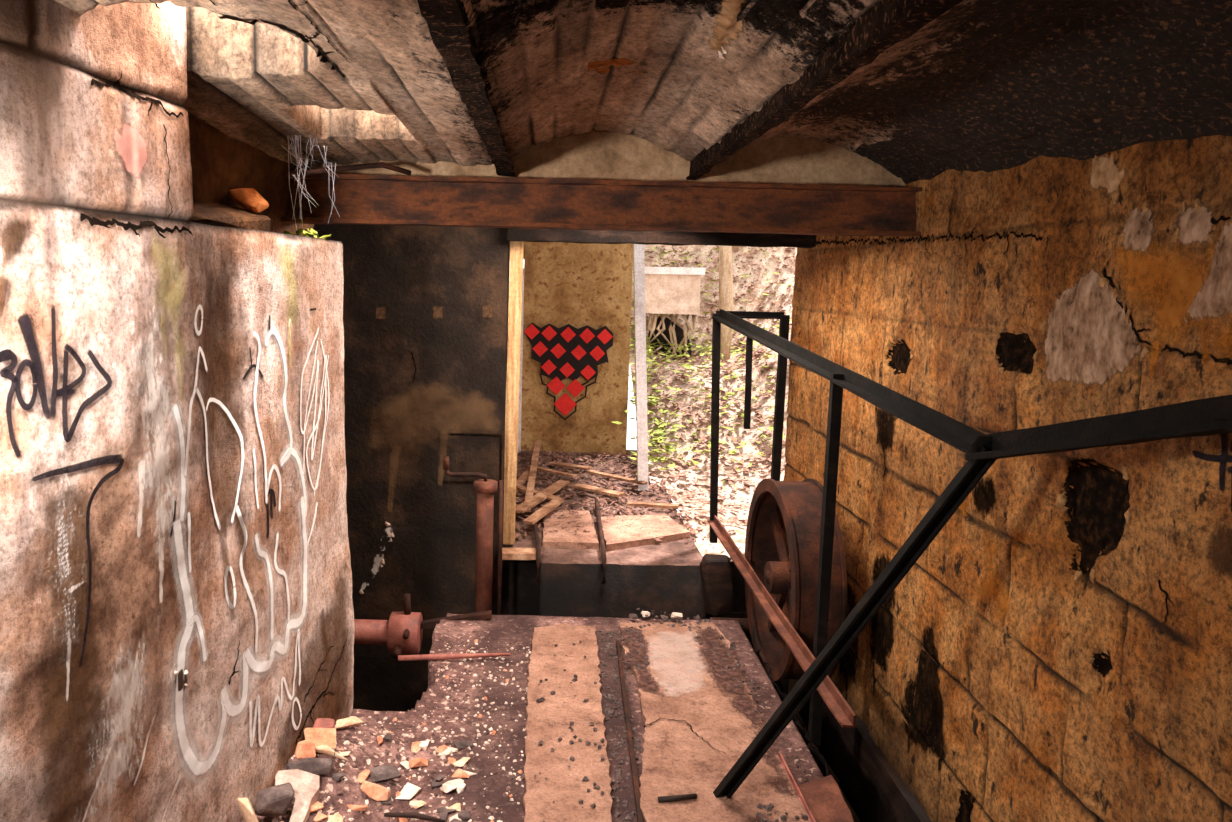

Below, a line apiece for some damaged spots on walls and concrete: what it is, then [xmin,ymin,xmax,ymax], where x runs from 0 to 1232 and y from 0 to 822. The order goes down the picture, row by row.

crack [815,226,1044,258]
peeling [1090,155,1154,252]
peeling [1172,198,1232,325]
crack [1103,268,1232,365]
leakage [373,388,494,512]
leakage [872,554,891,582]
leakage [838,591,895,699]
leakage [899,622,946,771]